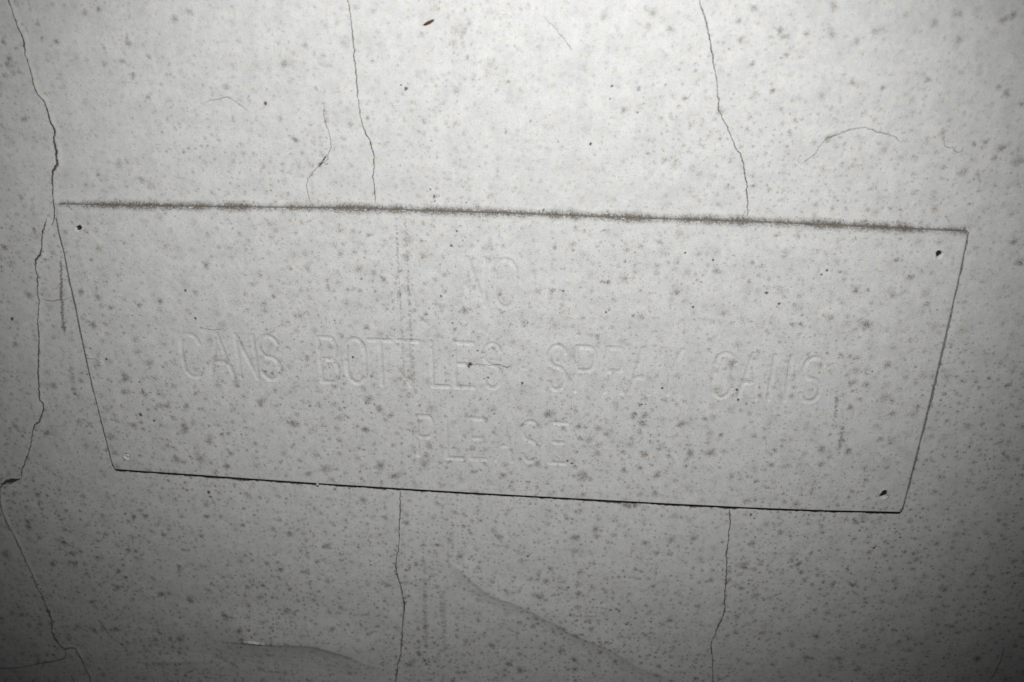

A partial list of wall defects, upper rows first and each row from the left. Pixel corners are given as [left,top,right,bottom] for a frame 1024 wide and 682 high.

crack [701,7,748,210]
crack [0,0,64,488]
crack [395,493,405,682]
crack [710,512,731,682]